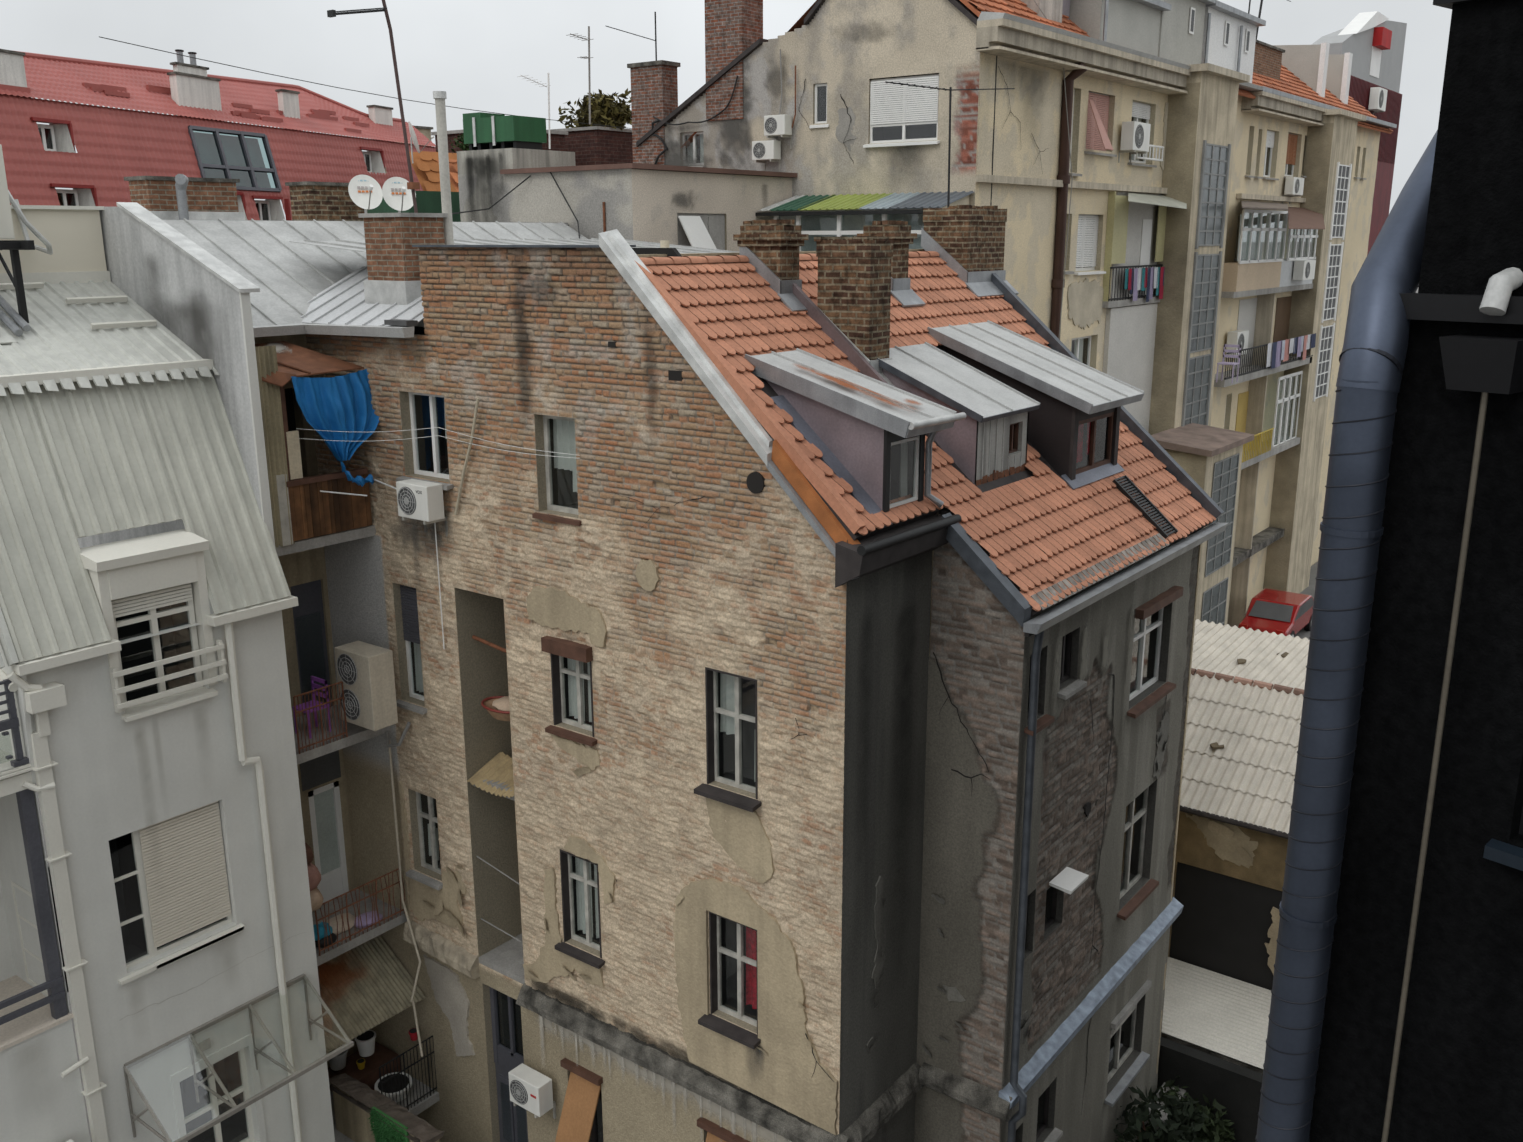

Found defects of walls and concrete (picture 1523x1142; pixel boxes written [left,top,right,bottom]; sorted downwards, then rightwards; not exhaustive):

crack [933,652,989,796]